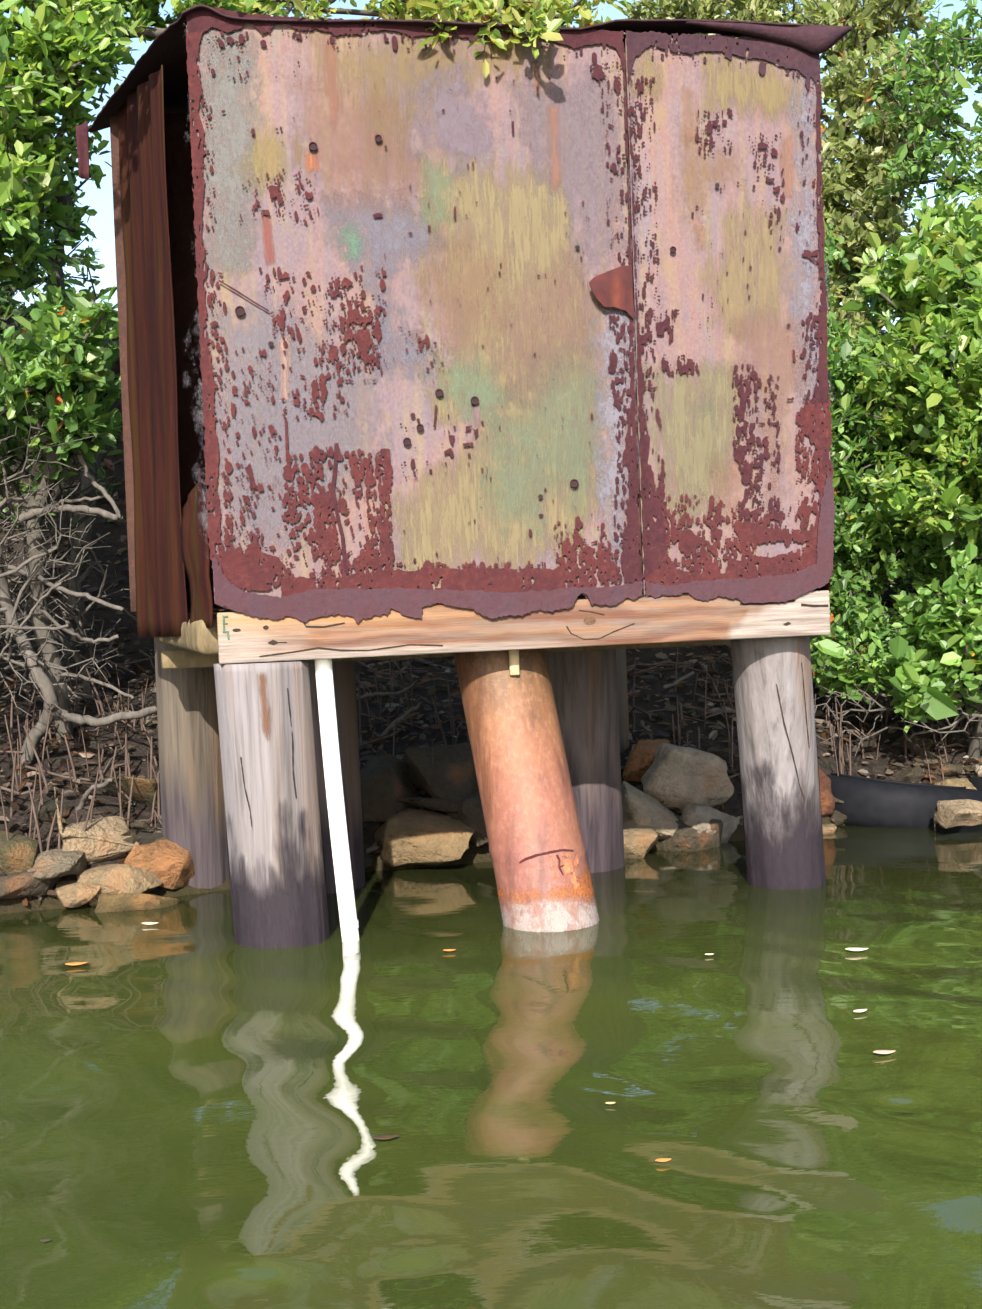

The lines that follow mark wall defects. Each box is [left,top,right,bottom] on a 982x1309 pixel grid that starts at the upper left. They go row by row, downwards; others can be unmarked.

corrosion [281,546,566,597]
corrosion [186,4,829,584]
peeling [210,265,836,623]
corrosion [497,865,595,902]